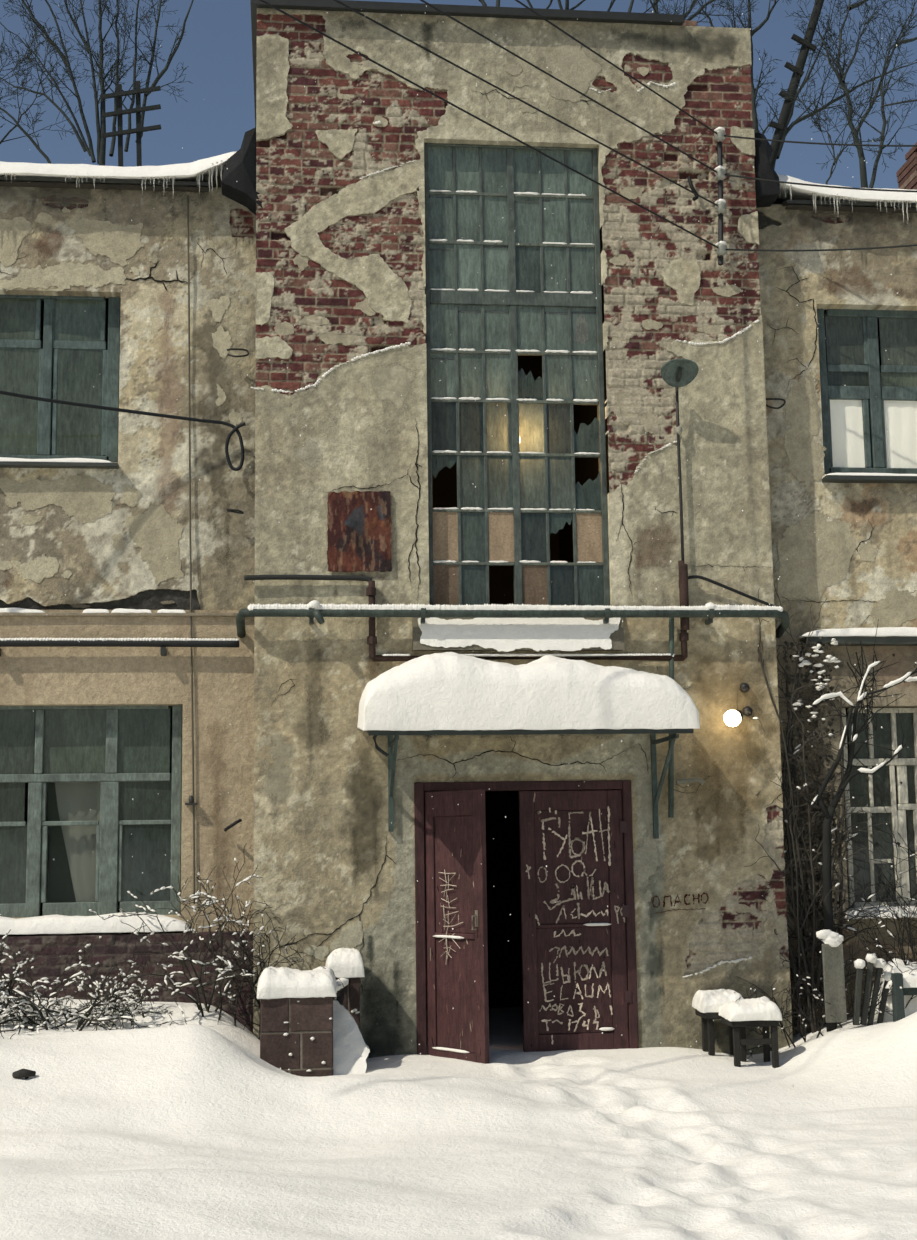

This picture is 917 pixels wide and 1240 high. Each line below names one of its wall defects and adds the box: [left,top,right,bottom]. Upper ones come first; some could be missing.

flaking render [229,14,448,396]
flaking render [519,37,781,493]
peeling [770,370,826,482]
peeling [0,475,200,610]
crack [790,600,875,626]
crack [398,739,648,778]
water stain [351,773,379,878]
flaking render [683,805,789,979]
water stain [364,936,402,1055]